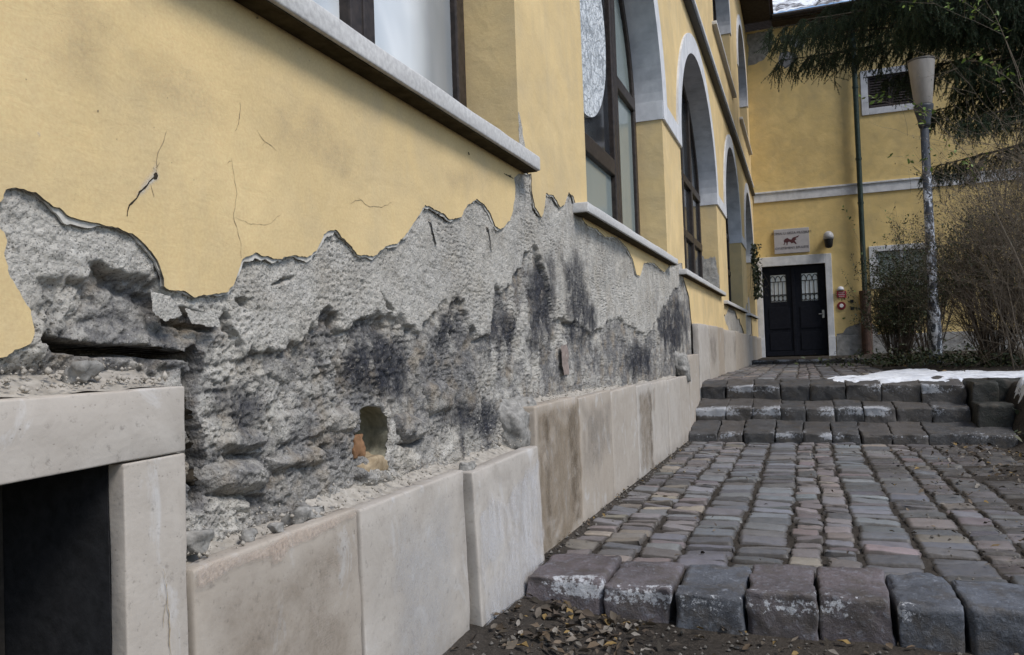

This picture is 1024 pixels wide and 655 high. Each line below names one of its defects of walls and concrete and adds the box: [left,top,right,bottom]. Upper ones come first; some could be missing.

crack [127,131,167,216]
spalling [0,173,693,545]
damp [343,333,405,395]
damp [489,314,515,342]
damp [529,257,596,345]
damp [629,343,650,376]
damp [658,304,687,360]
damp [443,403,497,453]